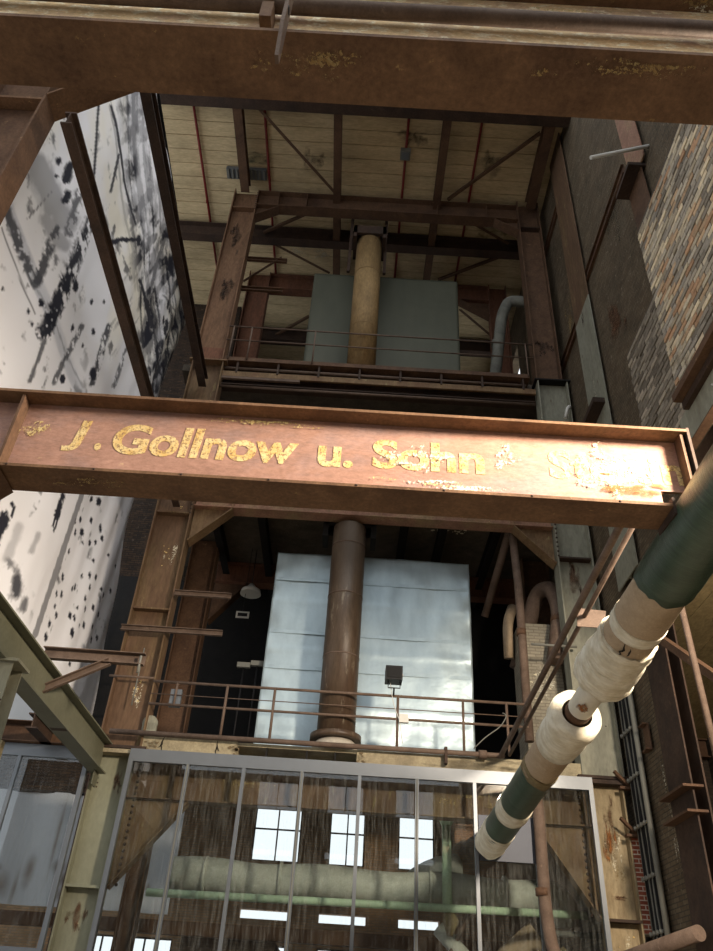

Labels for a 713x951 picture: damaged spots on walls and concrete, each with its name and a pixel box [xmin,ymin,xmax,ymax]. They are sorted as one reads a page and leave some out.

rust [603,811,617,860]